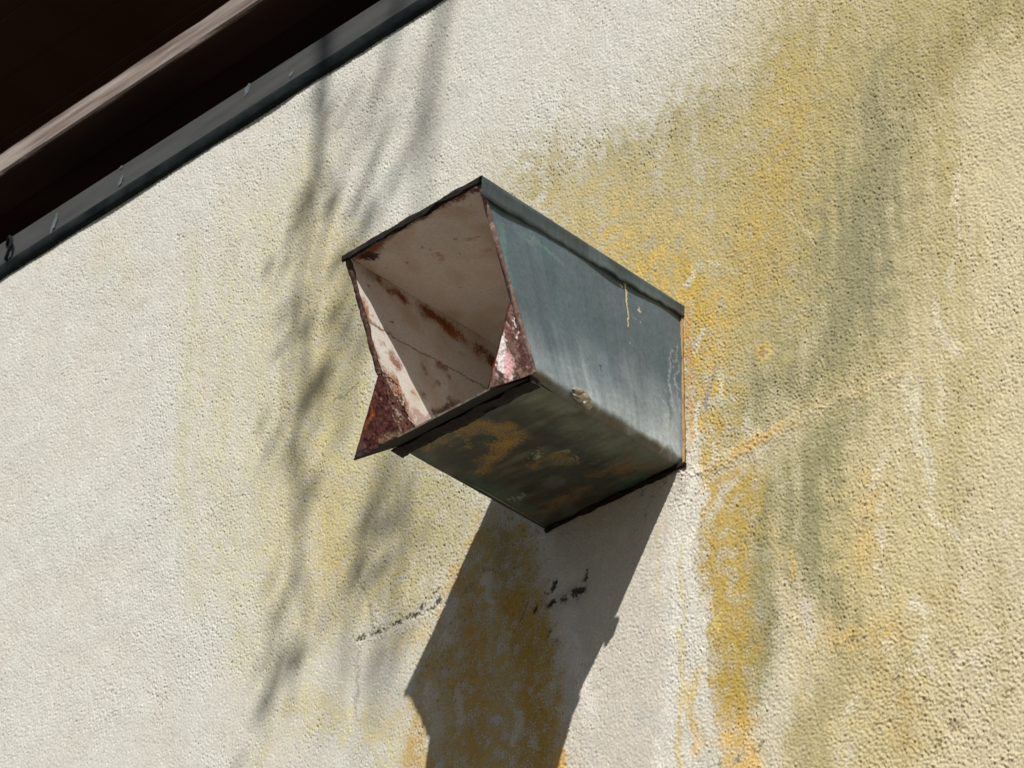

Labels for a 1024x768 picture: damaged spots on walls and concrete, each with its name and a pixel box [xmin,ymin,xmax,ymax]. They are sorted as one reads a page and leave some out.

water stain [829,187,911,356]
corrosion [683,303,698,440]
water stain [864,444,893,493]
water stain [871,489,895,556]
water stain [642,421,805,768]
water stain [957,575,976,604]
water stain [1005,548,1020,588]
water stain [891,620,938,678]
water stain [954,646,988,671]
water stain [982,626,1003,653]
water stain [833,638,961,768]
water stain [941,673,1024,768]